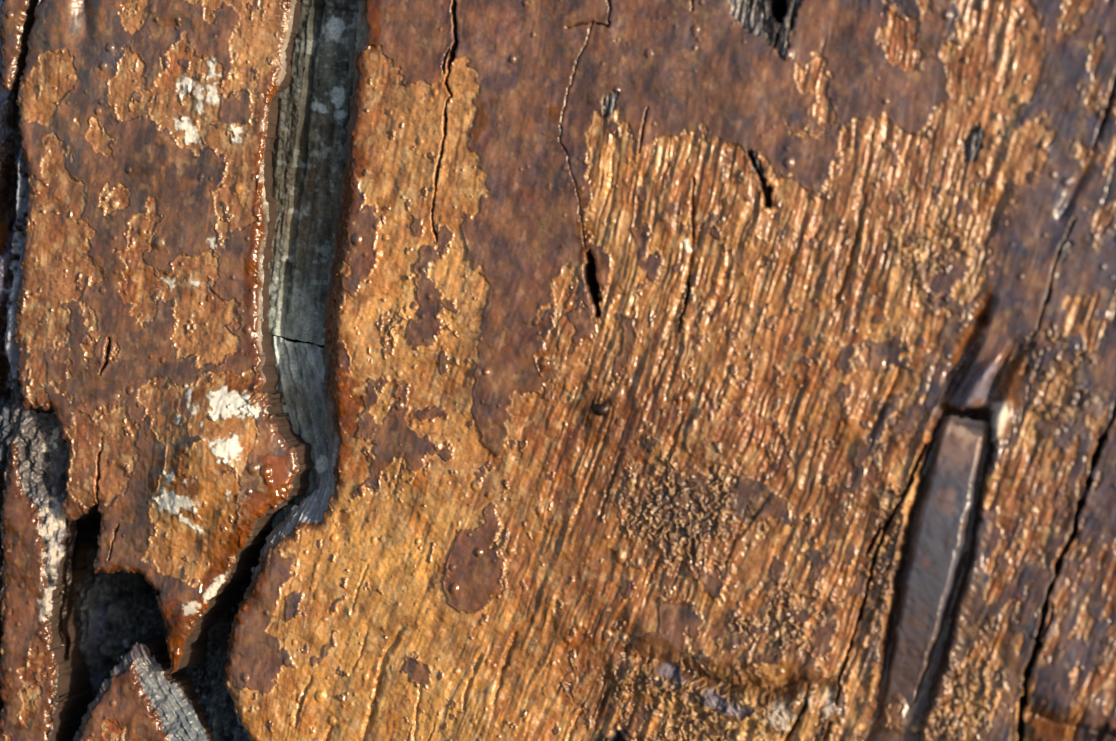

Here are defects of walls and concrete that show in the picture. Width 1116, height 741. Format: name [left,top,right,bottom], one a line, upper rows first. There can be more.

peeling [14,0,290,510]
crack [431,0,460,244]
crack [558,0,613,248]
peeling [224,0,1116,741]
peeling [142,493,236,596]
crack [785,443,928,741]
crack [1016,401,1116,741]